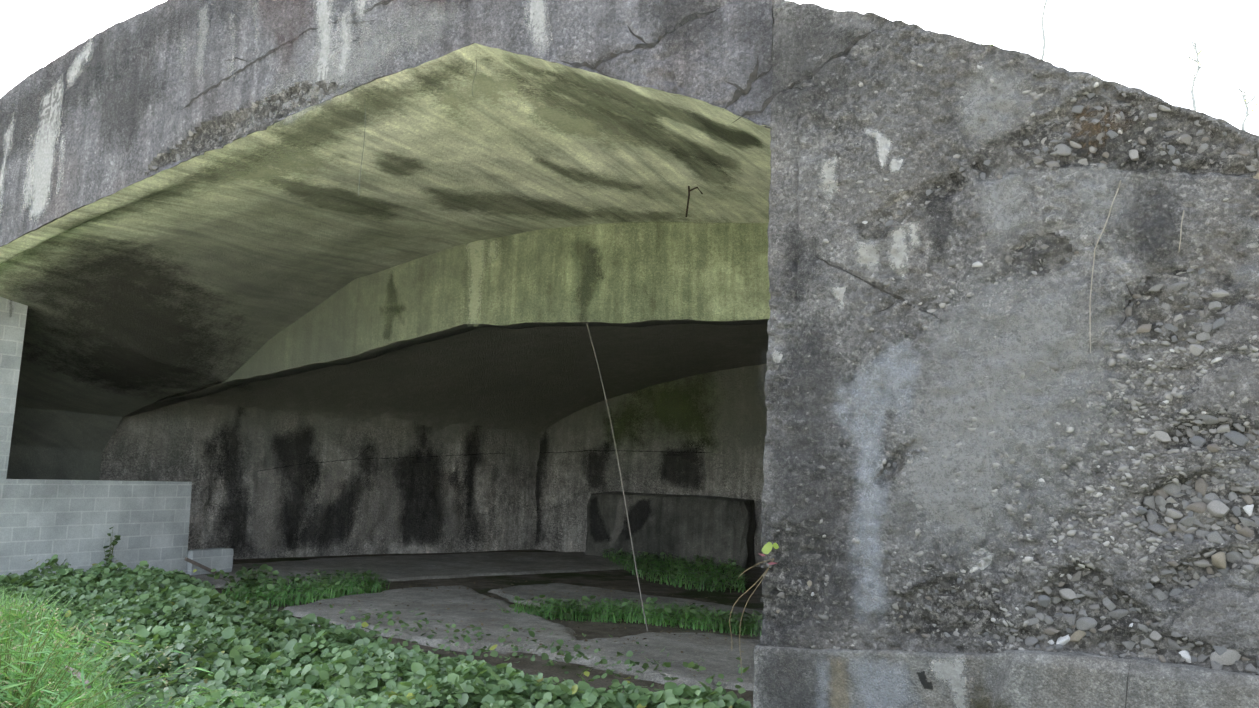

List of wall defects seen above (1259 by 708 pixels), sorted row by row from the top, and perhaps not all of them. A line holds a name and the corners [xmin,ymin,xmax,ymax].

leakage [0,0,240,217]
spalling [144,80,344,175]
crack [184,0,393,108]
leakage [60,0,759,229]
crack [561,7,721,79]
spalling [857,82,1259,277]
leakage [468,240,497,324]
leakage [201,412,252,552]
leakage [775,284,1105,634]
spalling [1137,475,1259,601]
spalling [1154,414,1259,453]
spalling [883,560,1259,675]